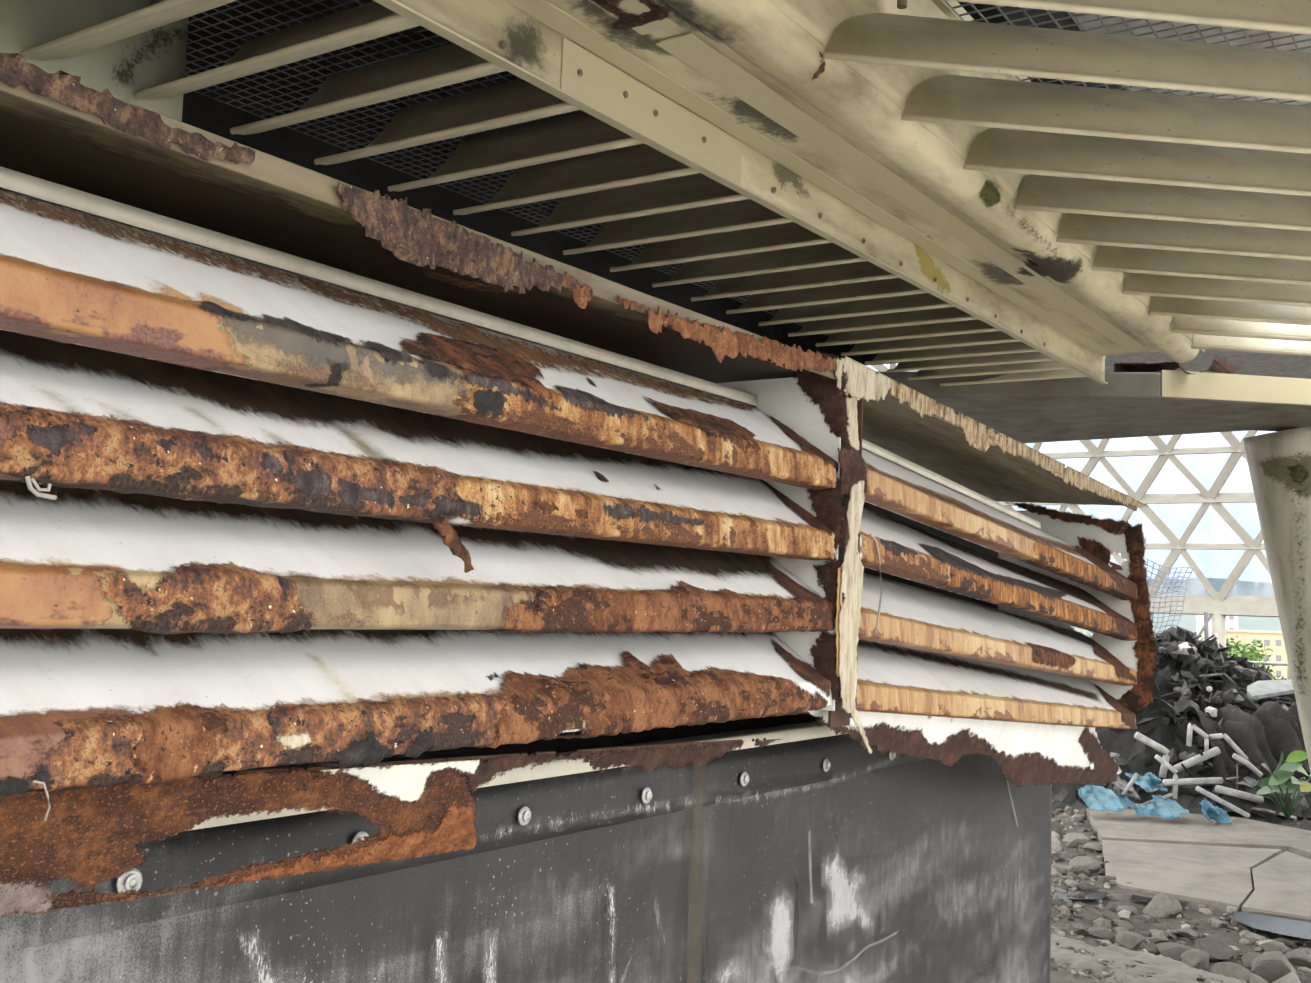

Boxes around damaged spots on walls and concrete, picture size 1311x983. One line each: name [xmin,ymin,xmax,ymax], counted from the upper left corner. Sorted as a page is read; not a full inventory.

mould [113,29,192,84]
leakage [508,25,541,67]
corrosion [572,0,735,55]
peeling [834,356,891,451]
corrosion [0,53,1159,915]
peeling [838,480,873,754]
efflorescence [826,857,869,929]
efflorescence [763,896,791,981]